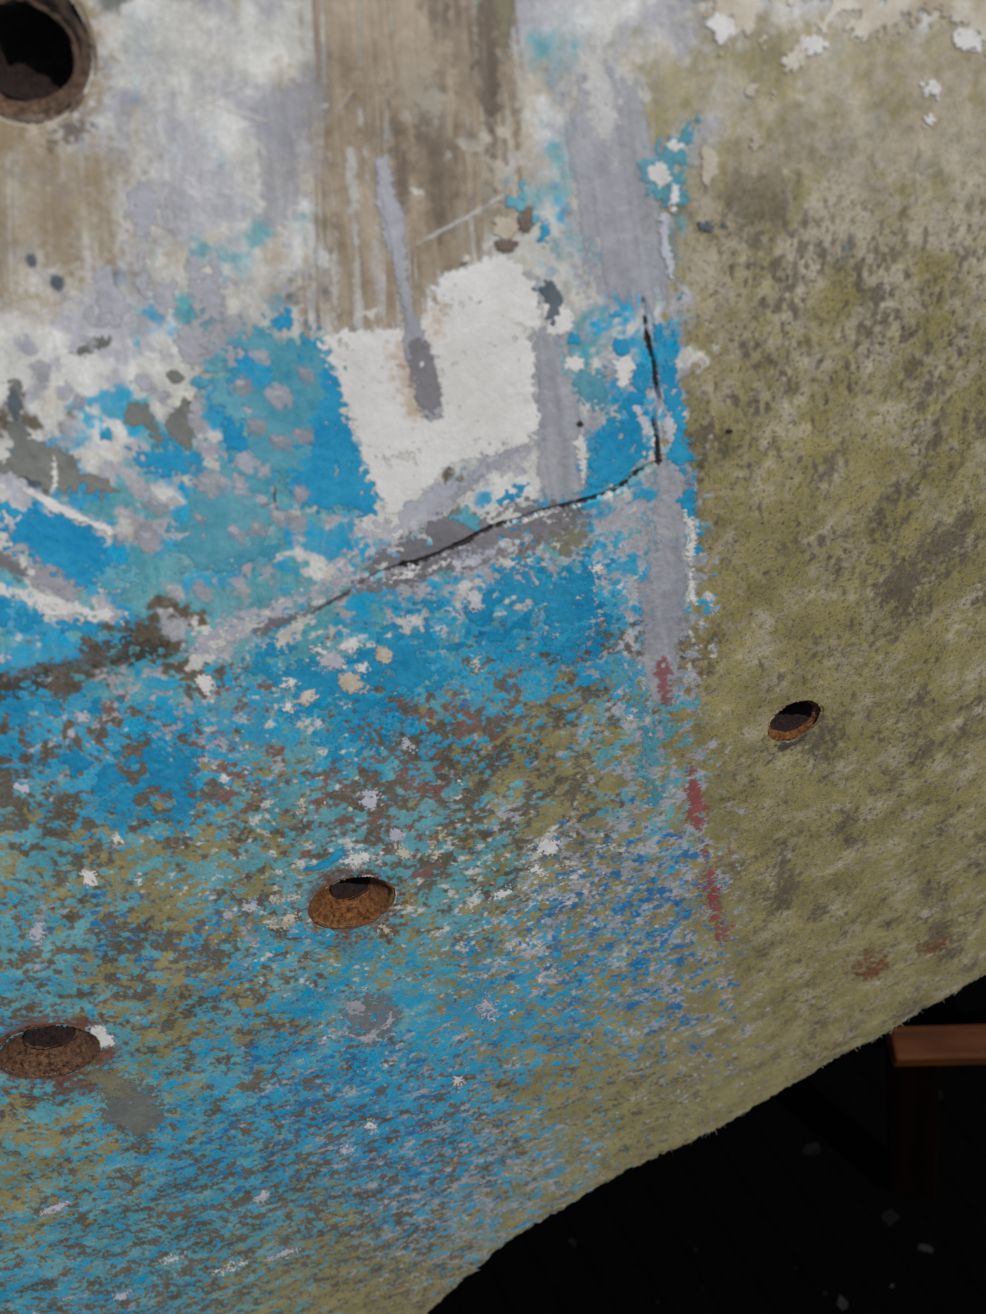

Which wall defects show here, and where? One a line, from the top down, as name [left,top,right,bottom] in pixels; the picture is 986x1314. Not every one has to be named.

peeling [695,0,986,73]
peeling [920,78,941,128]
peeling [697,221,727,232]
peeling [70,336,111,355]
peeling [100,40,719,763]
peeling [0,378,148,599]
crack [314,298,663,612]
peeling [0,595,124,759]
peeling [40,706,225,831]
corrosion [765,700,825,751]
corrosion [307,874,396,929]
corrosion [0,1009,120,1098]